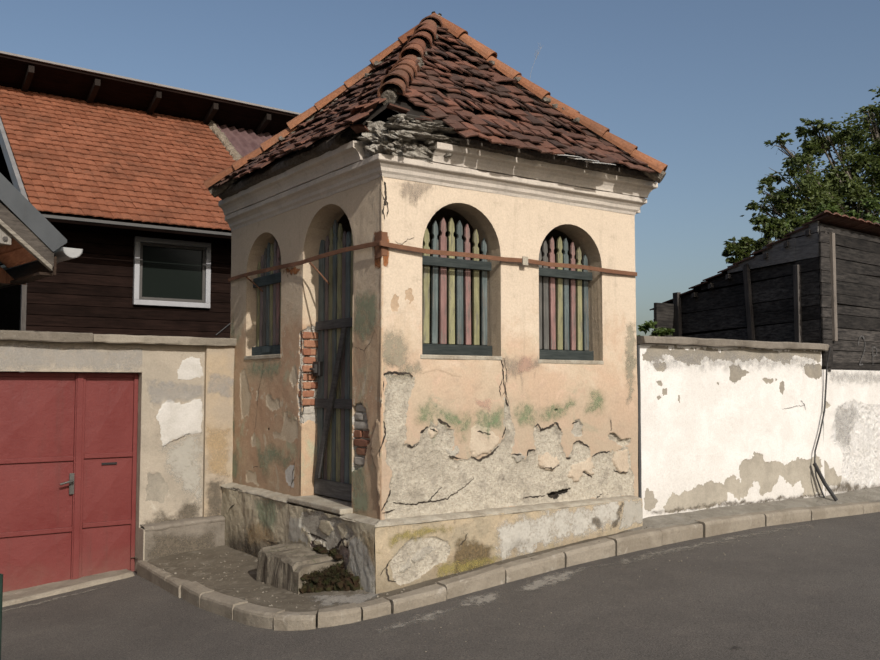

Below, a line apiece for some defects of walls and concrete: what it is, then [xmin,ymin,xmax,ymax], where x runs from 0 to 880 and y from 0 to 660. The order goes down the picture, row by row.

peeling [350,103,463,158]
rust [374,231,389,268]
flaking render [239,325,318,443]
crack [499,360,509,402]
spalling [352,371,880,519]
spalling [300,510,354,571]
spalling [389,536,450,586]